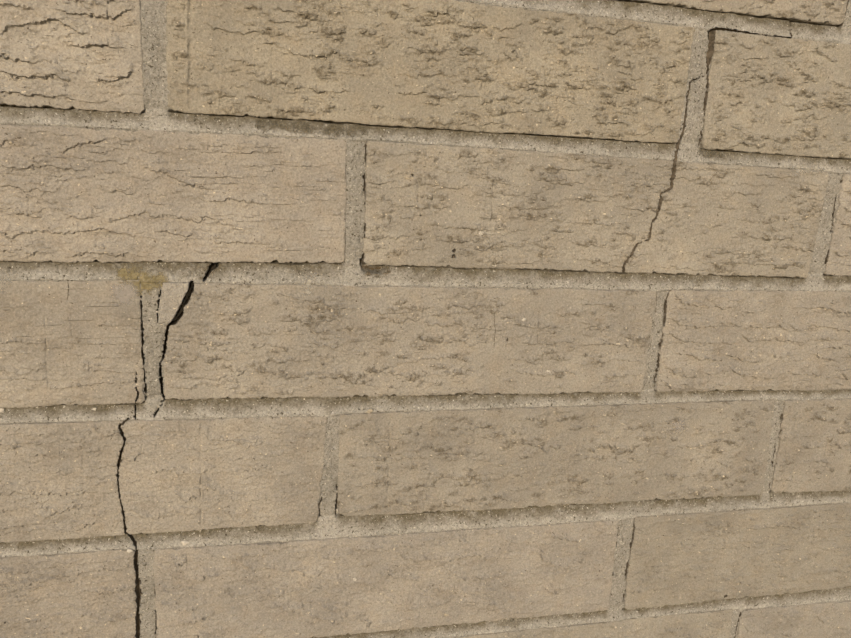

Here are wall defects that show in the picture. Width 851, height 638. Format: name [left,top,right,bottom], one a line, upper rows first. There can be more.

crack [622,23,792,272]
crack [117,263,216,638]